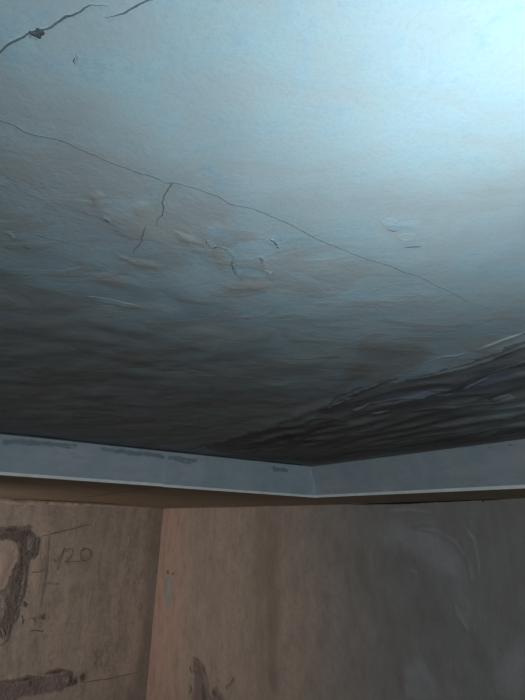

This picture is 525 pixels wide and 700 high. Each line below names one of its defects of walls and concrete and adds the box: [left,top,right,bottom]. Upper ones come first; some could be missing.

crack [0,0,157,55]
crack [0,120,488,309]
leakage [0,436,82,451]
leakage [96,335,525,466]